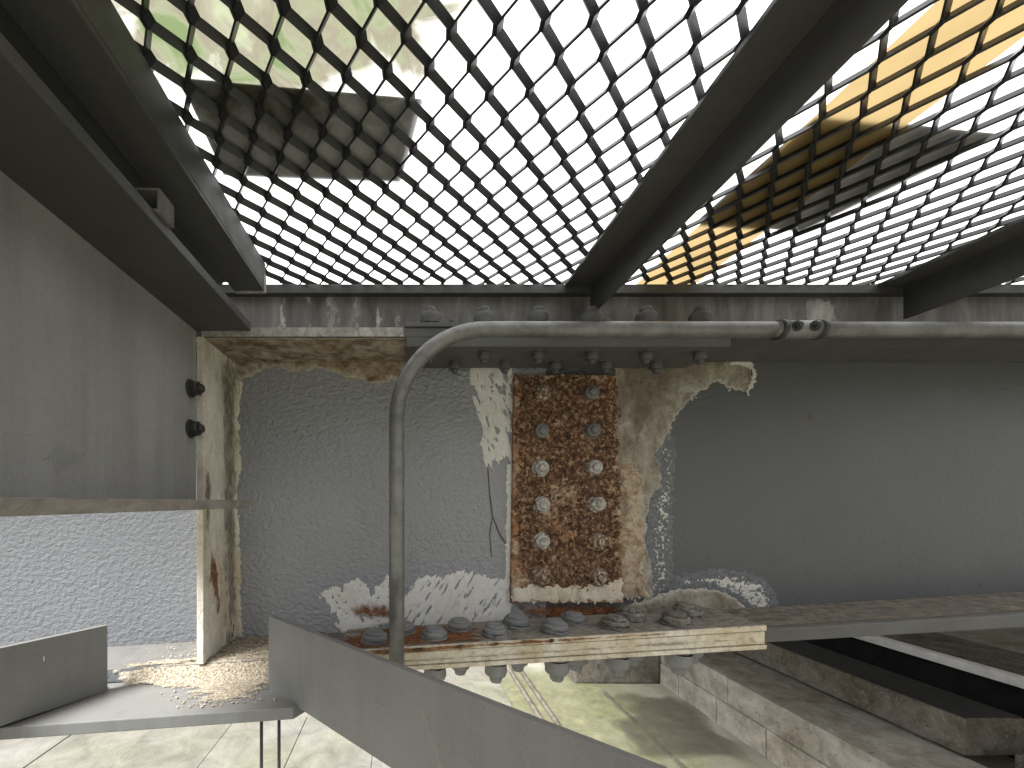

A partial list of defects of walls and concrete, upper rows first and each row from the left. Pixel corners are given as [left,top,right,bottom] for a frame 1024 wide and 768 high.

peeling [196,338,406,644]
crack [487,467,507,557]
rust [511,374,623,592]
spalling [404,362,780,626]
rust [210,554,220,613]
rust [342,606,389,654]
rust [404,626,659,653]
rust [520,606,617,617]